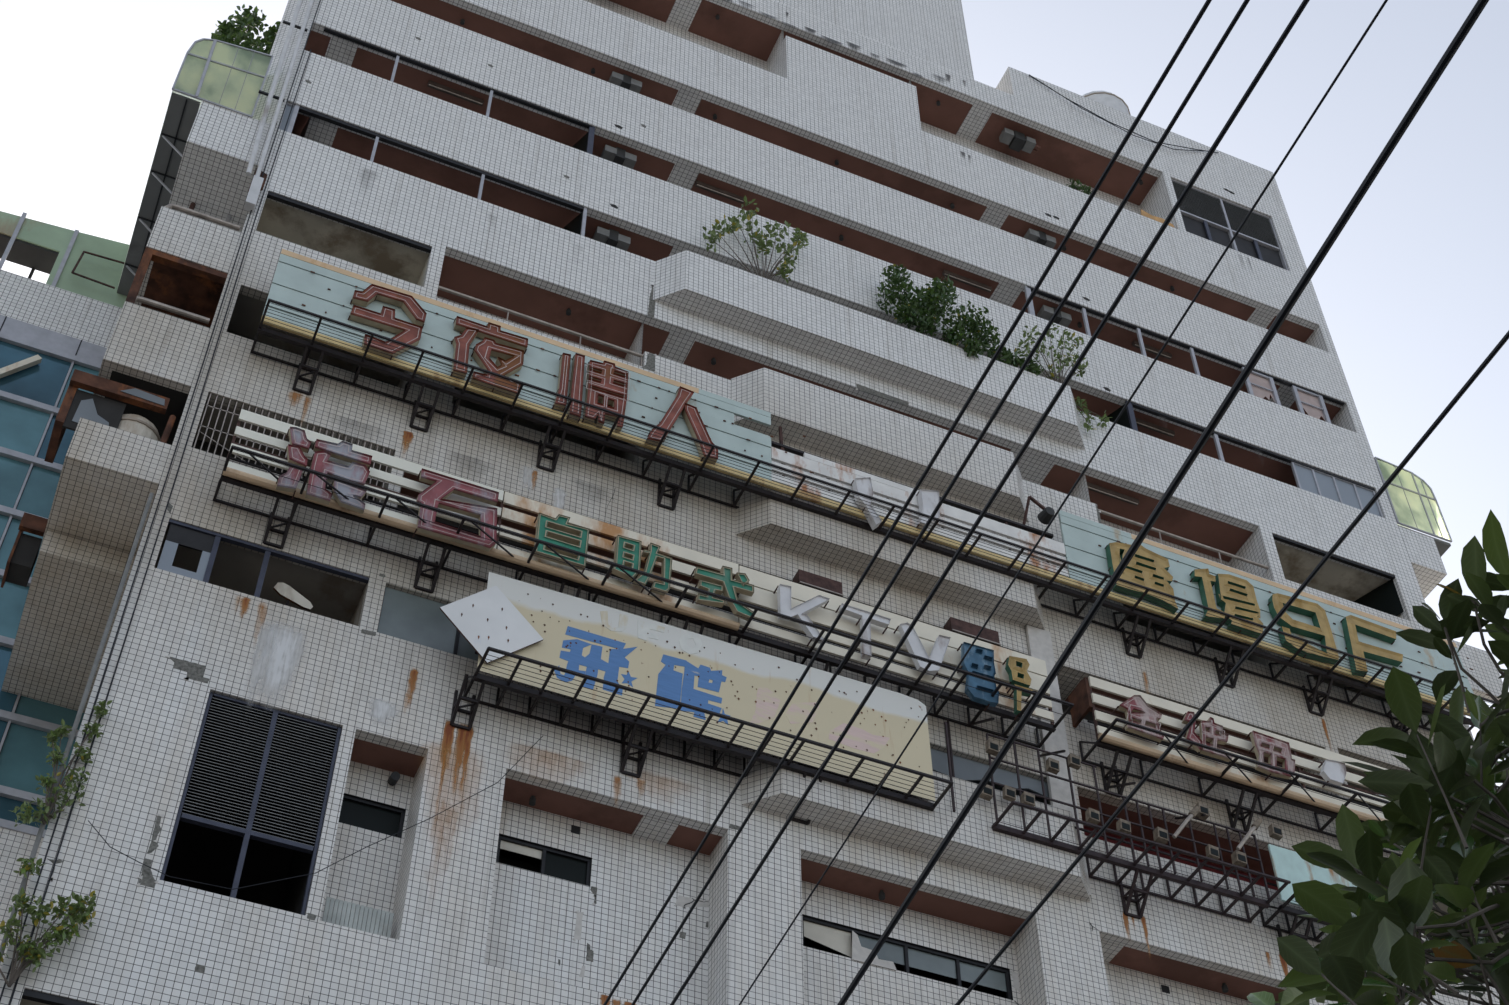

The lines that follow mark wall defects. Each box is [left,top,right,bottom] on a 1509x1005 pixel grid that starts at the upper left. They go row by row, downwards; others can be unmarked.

rust [241,597,264,615]
peeling [166,655,210,684]
damp [253,627,302,691]
rust [408,669,418,698]
rust [441,720,474,787]